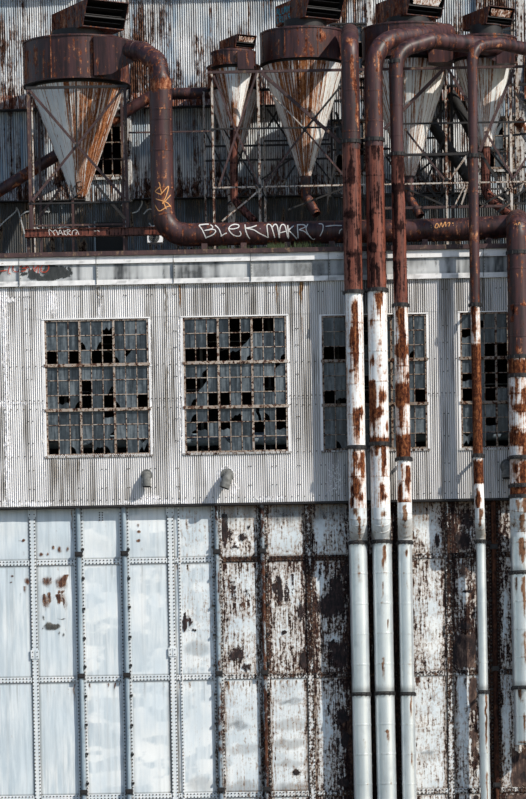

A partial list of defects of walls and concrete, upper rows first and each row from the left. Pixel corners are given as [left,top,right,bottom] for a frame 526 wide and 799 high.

rust [43,574,69,607]
spalling [272,563,350,623]
spalling [320,639,351,671]